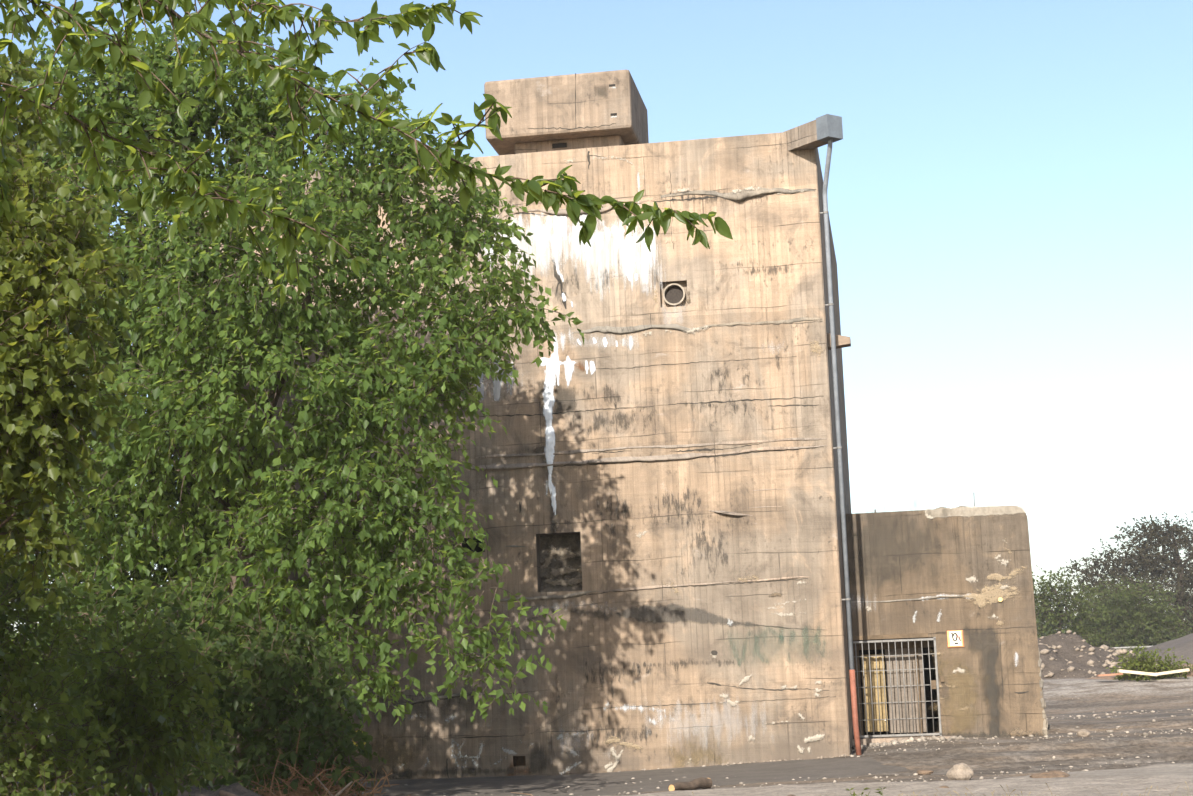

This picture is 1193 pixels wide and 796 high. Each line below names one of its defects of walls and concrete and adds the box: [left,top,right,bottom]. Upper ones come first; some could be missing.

leakage [483,215,656,284]
leakage [475,360,513,400]
leakage [541,336,633,534]
leakage [617,604,755,626]